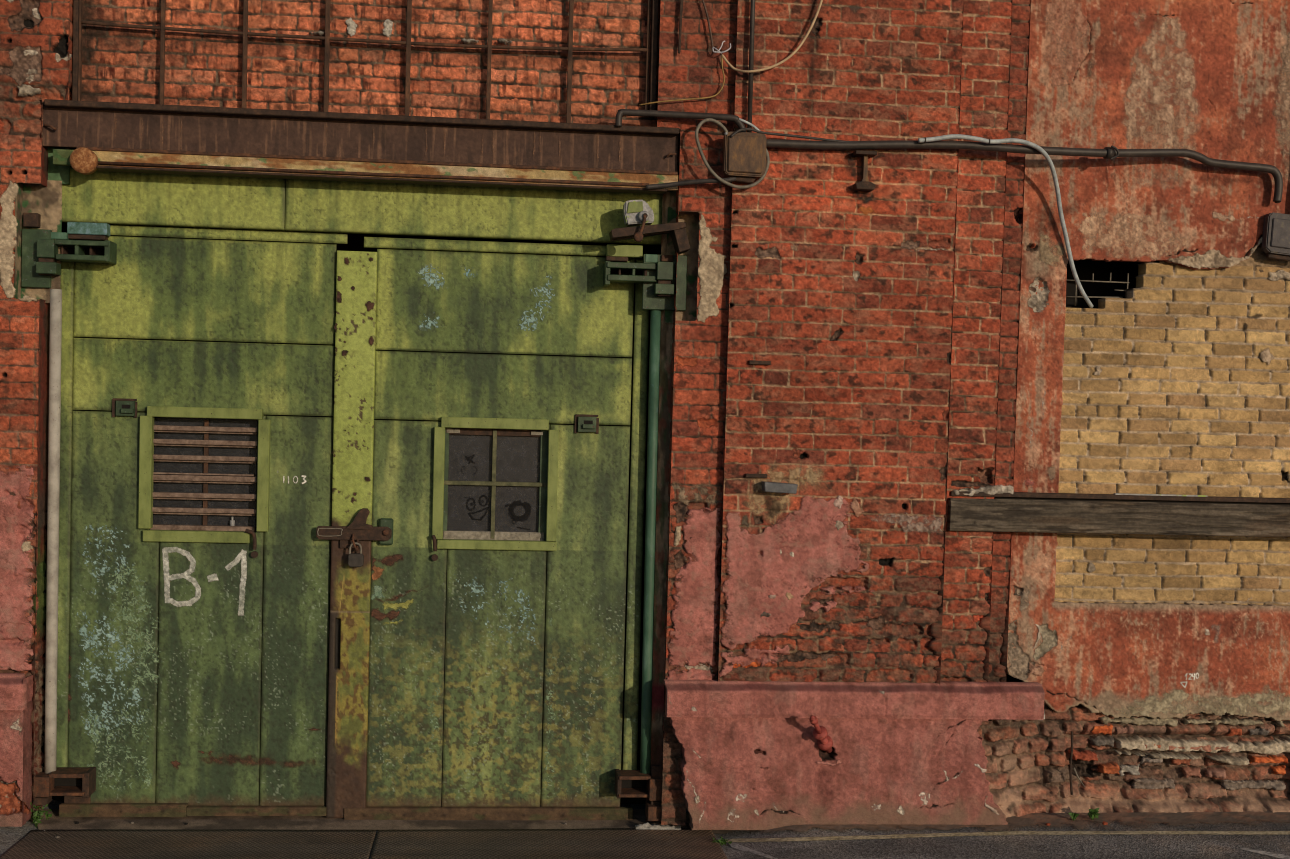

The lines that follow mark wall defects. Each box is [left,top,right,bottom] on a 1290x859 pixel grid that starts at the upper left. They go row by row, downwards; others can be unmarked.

spalling [0,0,72,86]
flaking render [0,181,37,302]
flaking render [697,214,737,322]
peeling [0,465,34,672]
peeling [667,496,893,680]
flaking render [1008,585,1069,680]
spalling [1068,689,1290,791]
flaking render [0,777,30,815]